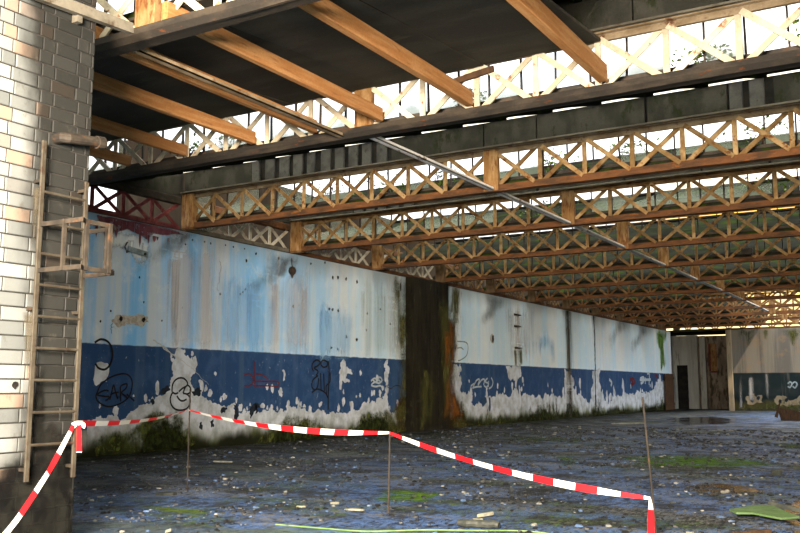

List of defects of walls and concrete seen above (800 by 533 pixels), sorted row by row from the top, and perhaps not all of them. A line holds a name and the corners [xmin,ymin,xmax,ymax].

leakage [95,225,169,262]
flaking render [110,310,148,327]
peeling [86,348,405,456]
rust [441,306,465,424]
peeling [449,363,666,427]